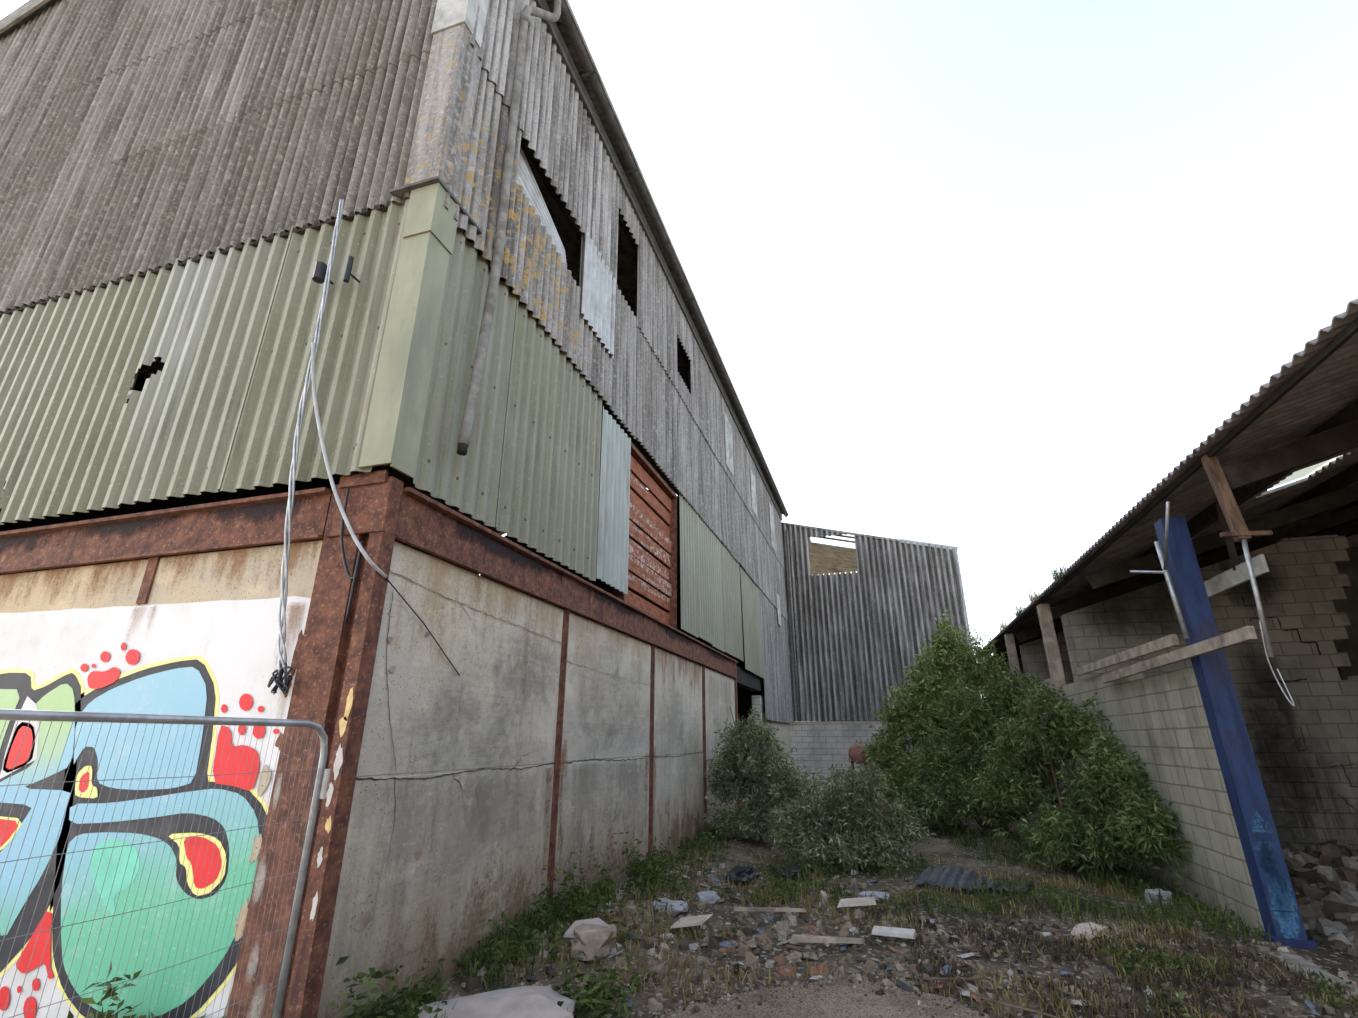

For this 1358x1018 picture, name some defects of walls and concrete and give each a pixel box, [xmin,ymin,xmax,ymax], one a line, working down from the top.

rust [287,541,317,572]
rust [284,606,304,698]
peeling [317,687,353,868]
peeling [310,892,318,920]